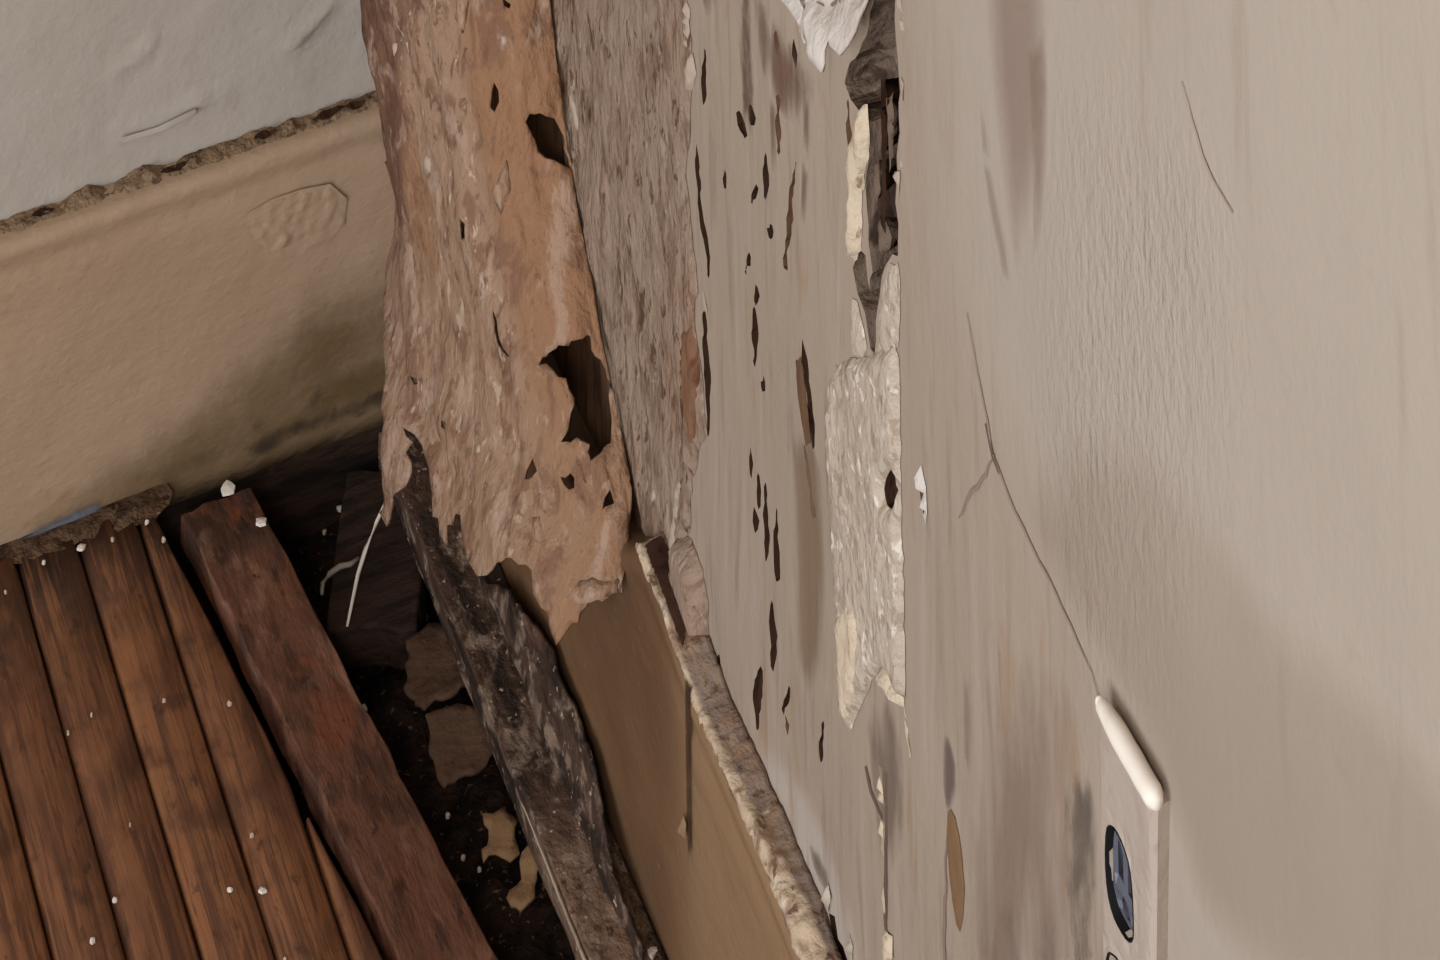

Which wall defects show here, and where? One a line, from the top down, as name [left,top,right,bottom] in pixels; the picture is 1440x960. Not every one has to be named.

peeling [774,0,868,72]
peeling [360,0,853,960]
spalling [796,340,927,757]
crack [958,313,1098,696]
leakage [1067,786,1090,904]